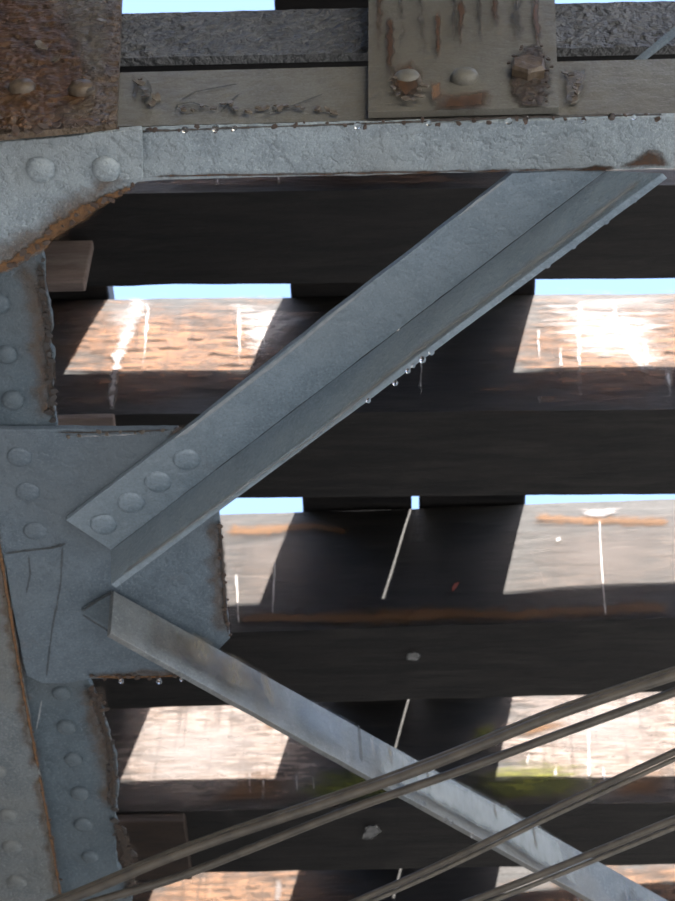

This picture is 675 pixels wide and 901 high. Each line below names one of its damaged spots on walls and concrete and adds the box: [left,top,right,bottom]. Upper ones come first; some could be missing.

corrosion [0,0,120,137]
corrosion [142,0,662,133]
corrosion [0,182,135,423]
water stain [65,301,300,406]
water stain [505,299,675,401]
corrosion [0,546,63,895]
corrosion [88,672,178,868]